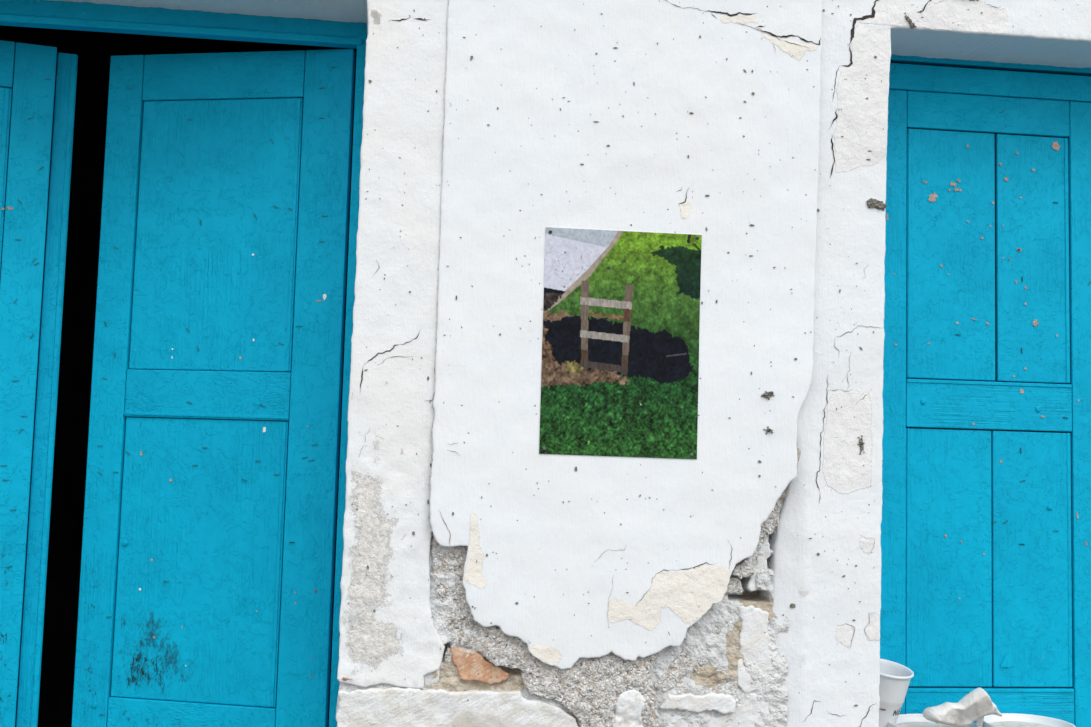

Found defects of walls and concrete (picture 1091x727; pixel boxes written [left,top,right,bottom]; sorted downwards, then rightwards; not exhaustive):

crack [666,0,821,60]
crack [830,0,1009,177]
crack [352,331,420,395]
crack [816,325,880,501]
flaking render [336,469,795,727]